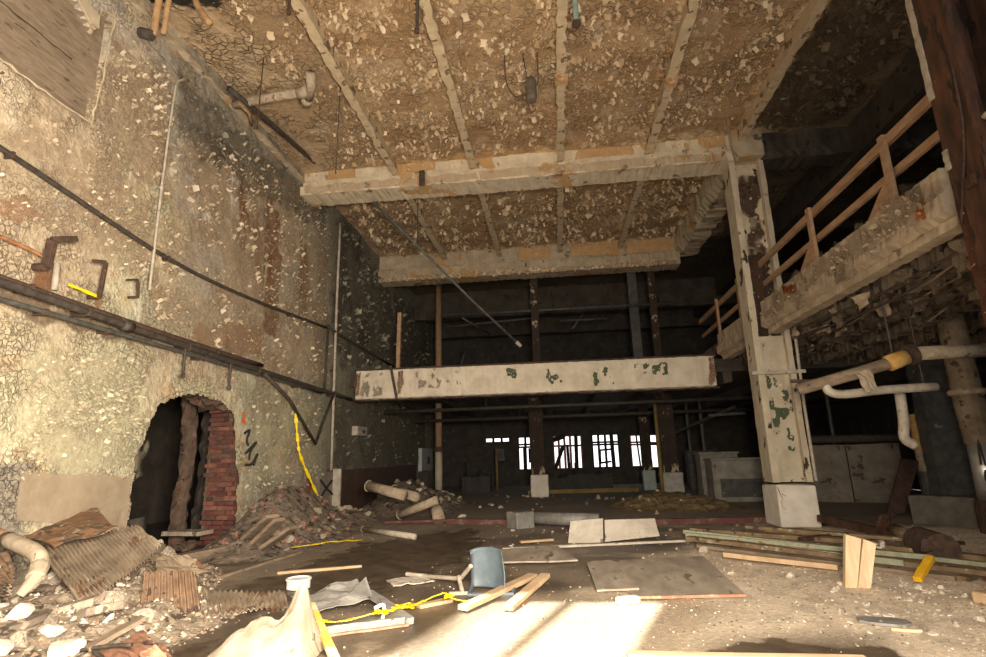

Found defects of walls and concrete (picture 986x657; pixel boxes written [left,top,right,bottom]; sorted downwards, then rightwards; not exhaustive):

peeling [662,0,802,147]
rust [34,267,61,291]
flaking render [0,0,702,553]
peeling [767,376,795,451]